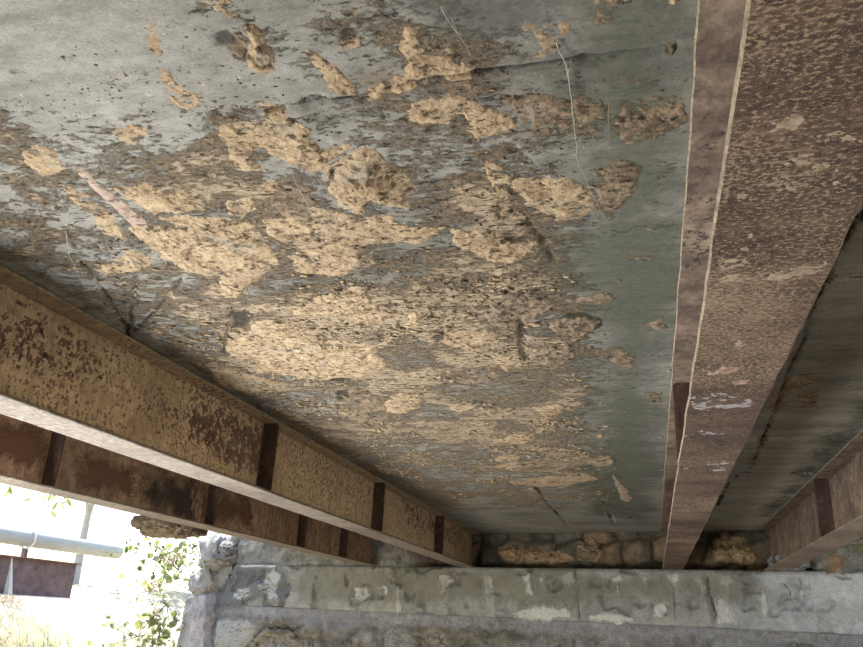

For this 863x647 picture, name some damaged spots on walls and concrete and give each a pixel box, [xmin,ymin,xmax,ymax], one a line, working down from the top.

crack [290,94,370,105]
spalling [305,26,475,101]
crack [389,45,664,87]
spalling [407,89,689,146]
spalling [22,145,542,298]
crack [840,210,863,249]
corrosion [0,288,124,397]
spalling [208,286,425,424]
crack [717,284,825,505]
corrosion [0,423,48,467]
corrosion [133,384,263,481]
corrosion [78,456,252,528]